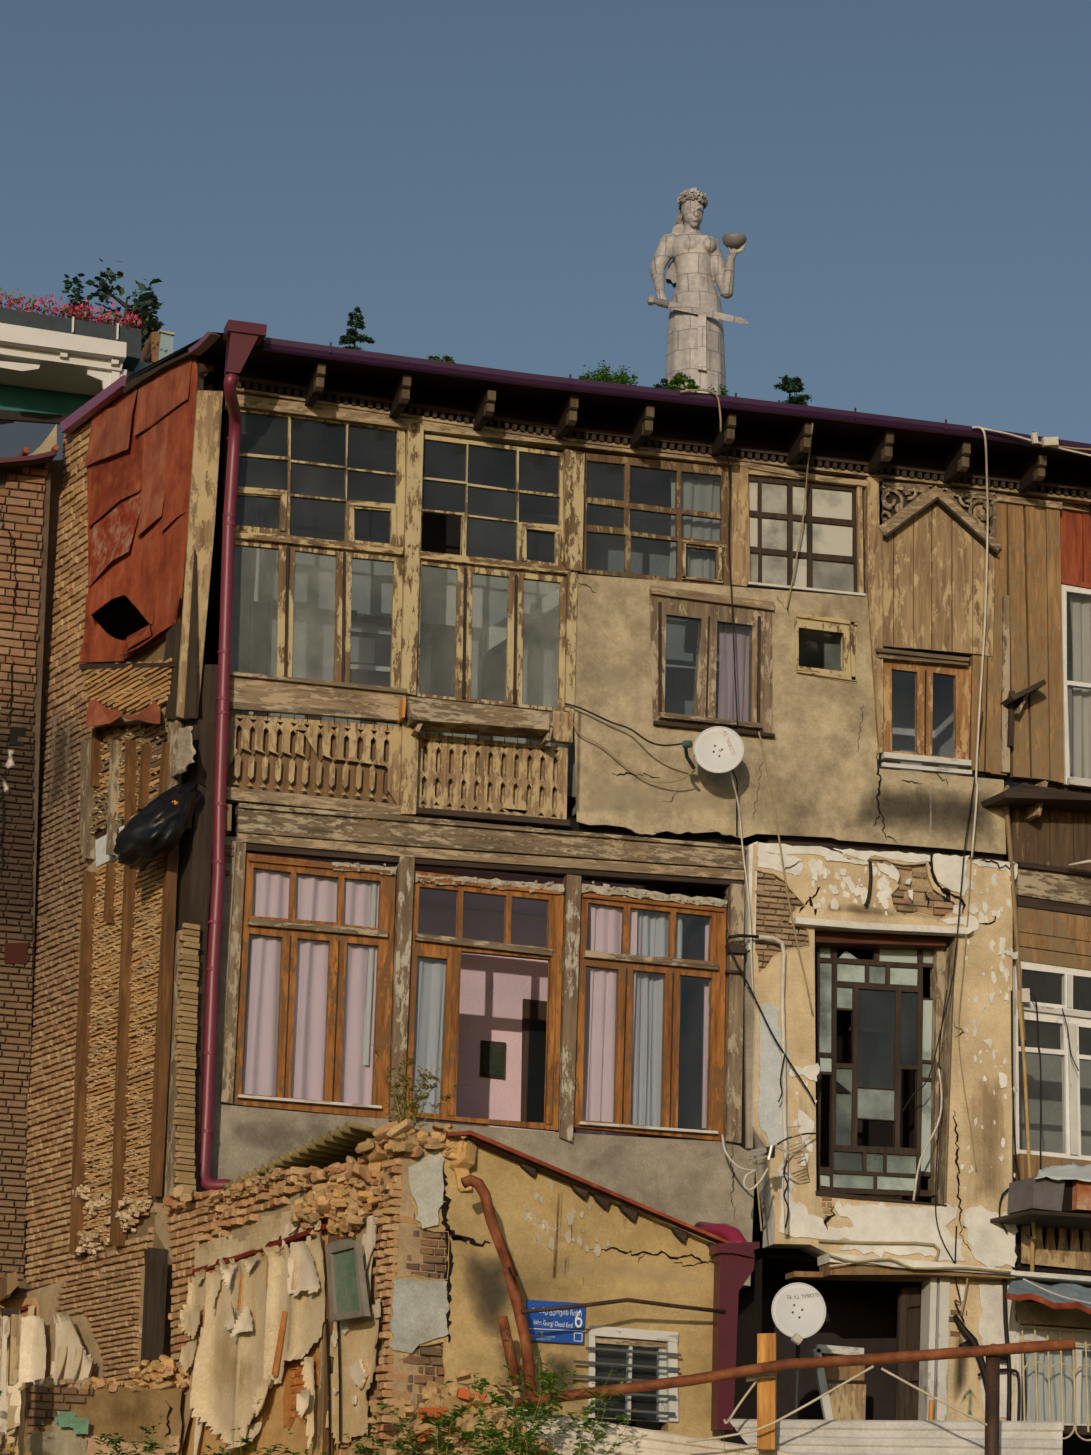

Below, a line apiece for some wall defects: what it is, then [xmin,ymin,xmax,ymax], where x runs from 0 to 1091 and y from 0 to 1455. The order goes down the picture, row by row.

crack [857,705,948,842]
spalling [605,821,691,859]
spalling [711,827,740,836]
crack [782,846,844,915]
crack [924,853,996,925]
peeling [752,842,1018,1418]
spalling [161,1118,479,1412]
crack [441,1167,490,1342]
crack [590,1247,714,1267]
spalling [18,1315,203,1393]
flaking render [181,1323,368,1455]